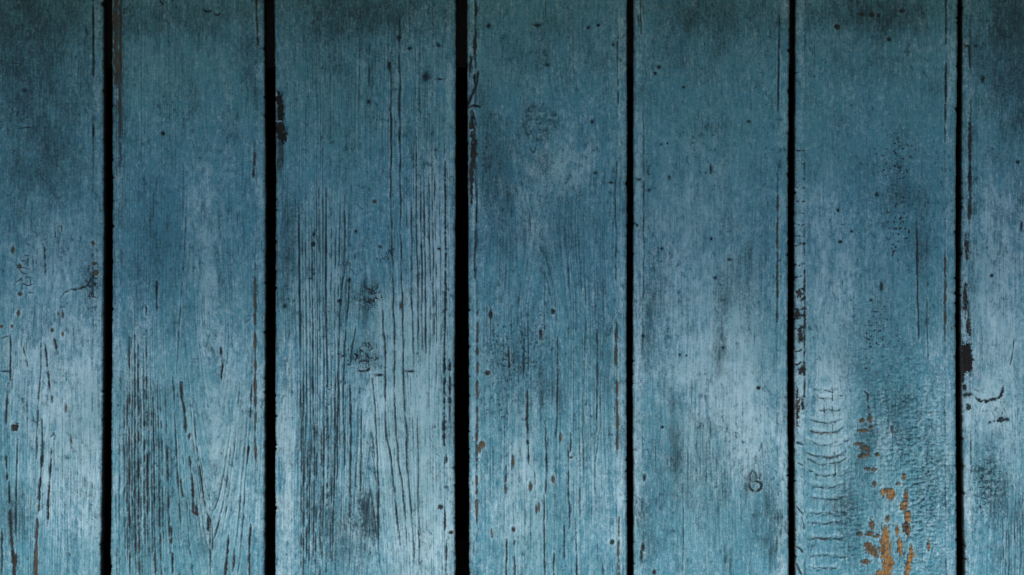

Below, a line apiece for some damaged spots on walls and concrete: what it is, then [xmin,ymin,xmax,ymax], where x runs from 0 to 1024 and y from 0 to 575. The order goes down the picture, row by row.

crack [776,150,869,569]
peeling [841,417,915,575]